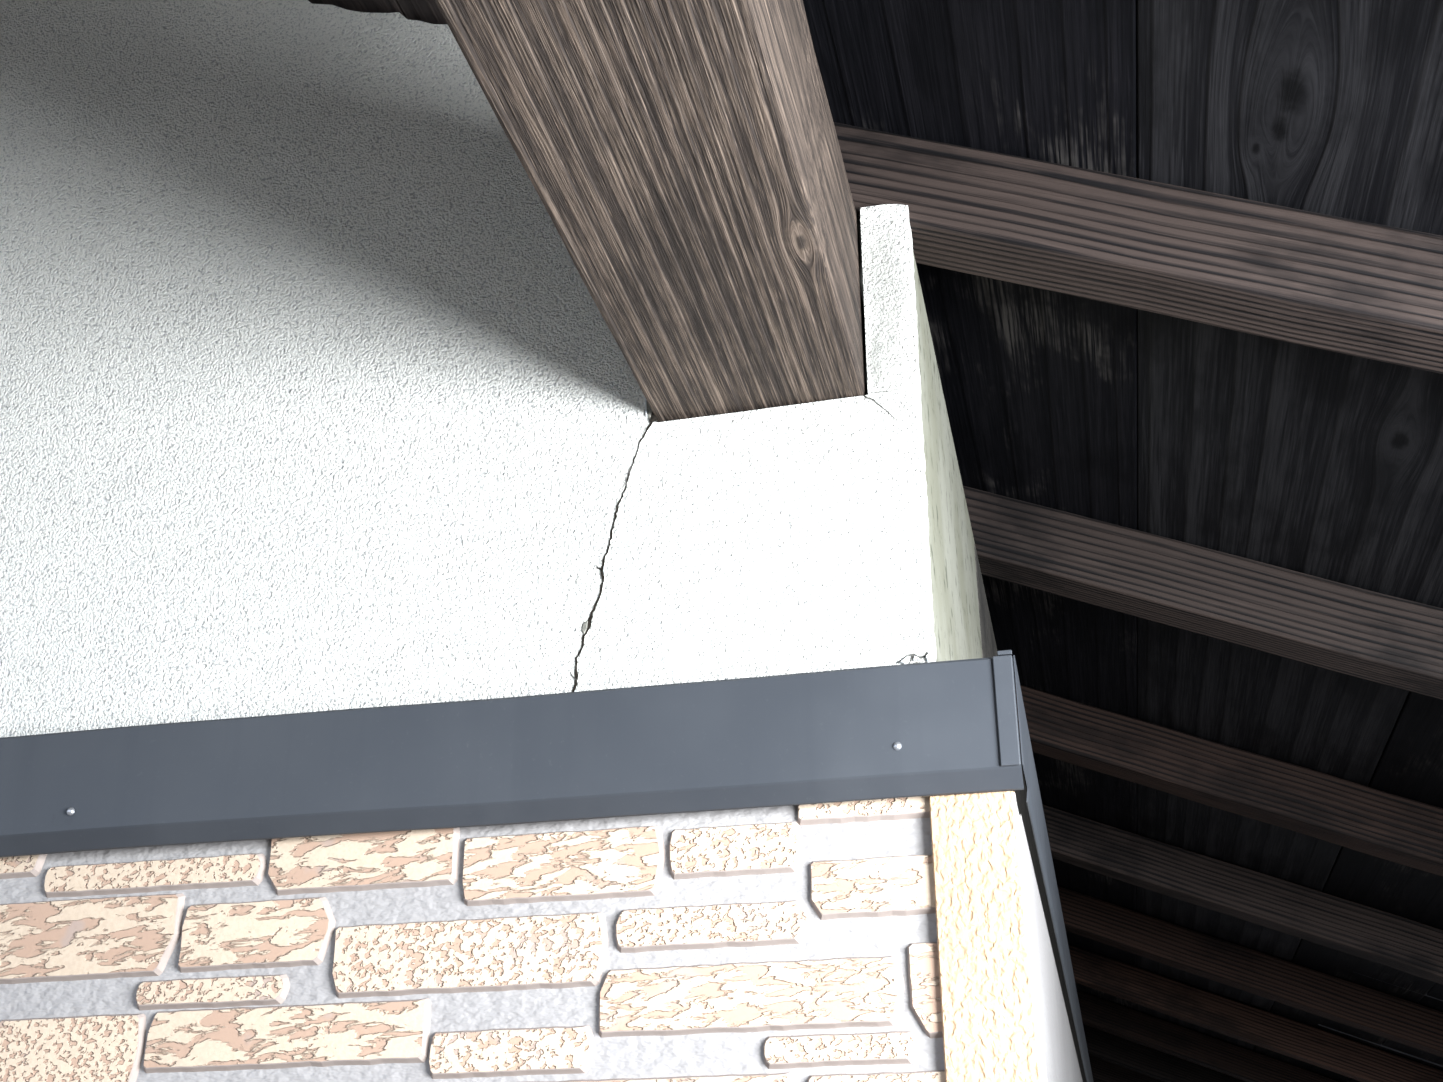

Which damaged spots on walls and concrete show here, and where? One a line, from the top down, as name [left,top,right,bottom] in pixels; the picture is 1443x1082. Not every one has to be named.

crack [569,411,653,692]